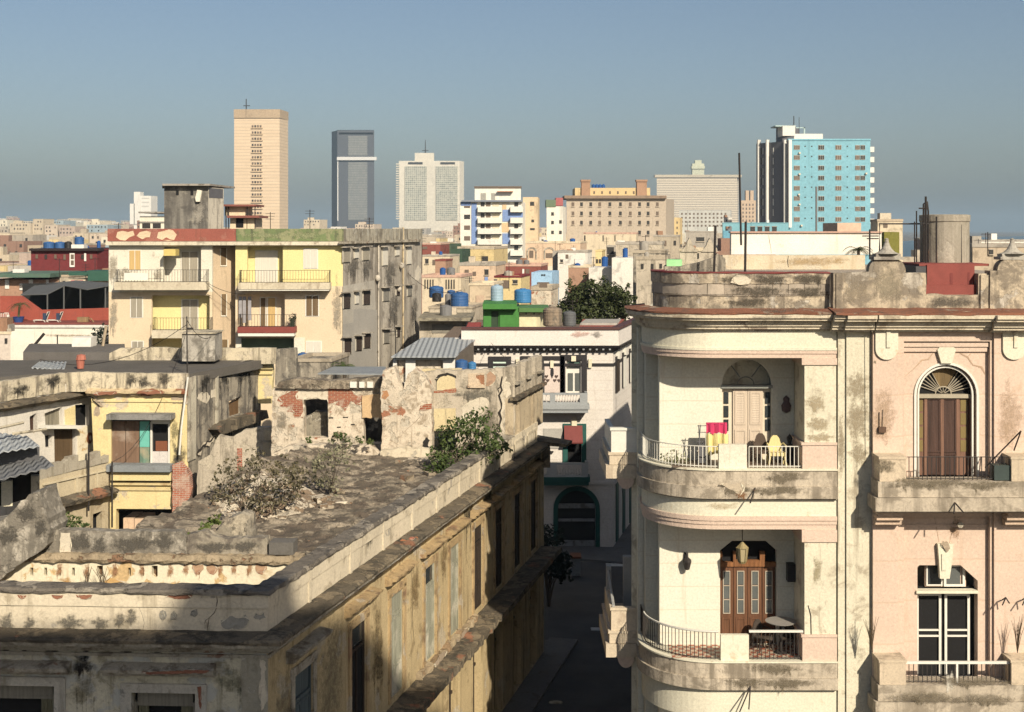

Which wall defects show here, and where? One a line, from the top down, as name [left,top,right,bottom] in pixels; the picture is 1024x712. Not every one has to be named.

peeling [116,229,177,241]
water stain [349,260,371,280]
water stain [386,265,399,324]
flaking render [277,389,362,428]
spalling [419,373,456,411]
spalling [460,371,511,425]
water stain [807,375,1007,492]
water stain [58,616,80,628]
water stain [93,609,136,629]
water stain [73,650,93,702]